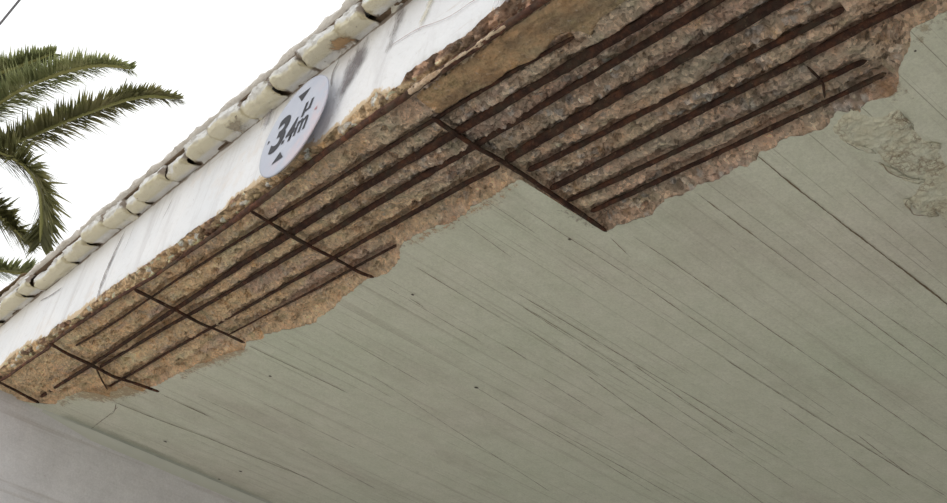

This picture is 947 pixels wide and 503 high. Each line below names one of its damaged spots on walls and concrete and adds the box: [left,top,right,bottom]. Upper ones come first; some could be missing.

spalling [0,0,568,404]
rust [330,37,354,50]
spalling [417,0,947,232]